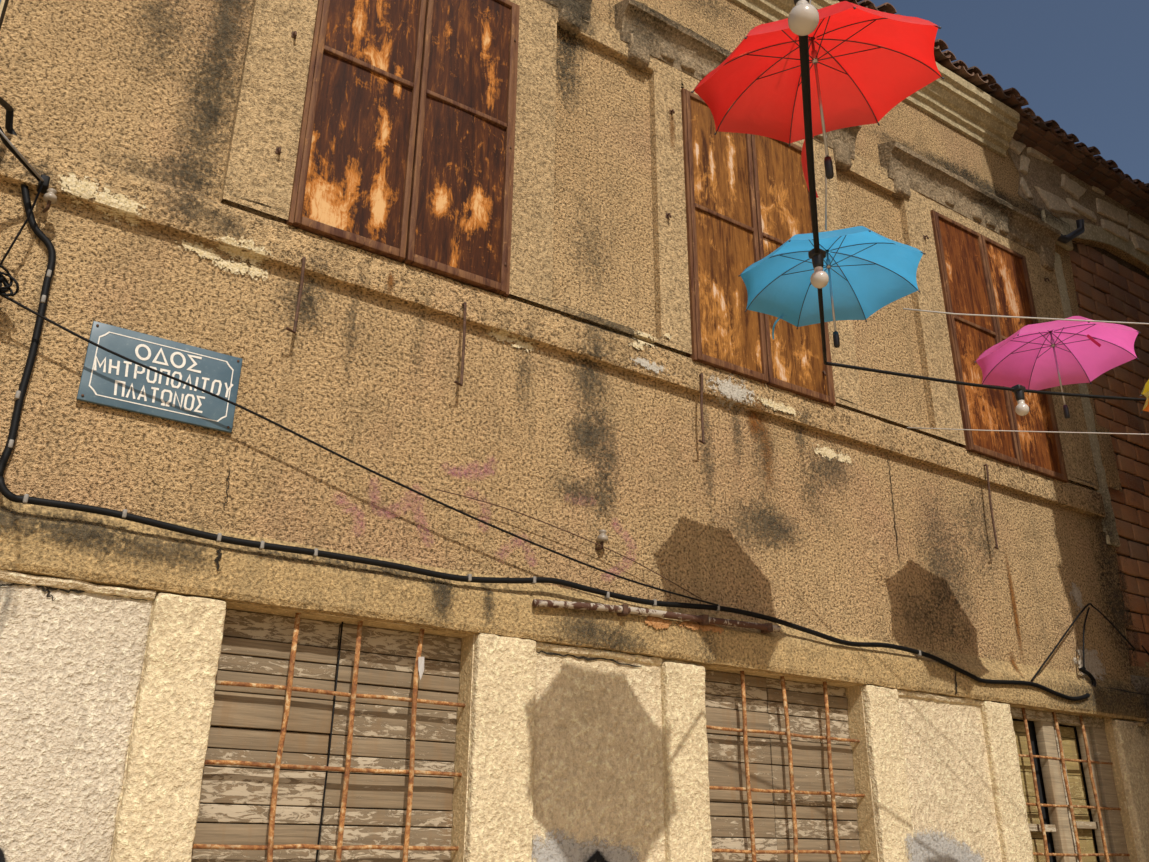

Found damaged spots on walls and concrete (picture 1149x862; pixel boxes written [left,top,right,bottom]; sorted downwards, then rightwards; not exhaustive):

leakage [126,0,257,236]
peeling [58,173,146,226]
peeling [175,233,273,281]
leakage [554,305,646,516]
leakage [722,447,800,549]
crack [0,583,147,601]
leakage [905,491,993,641]
crack [536,650,641,667]